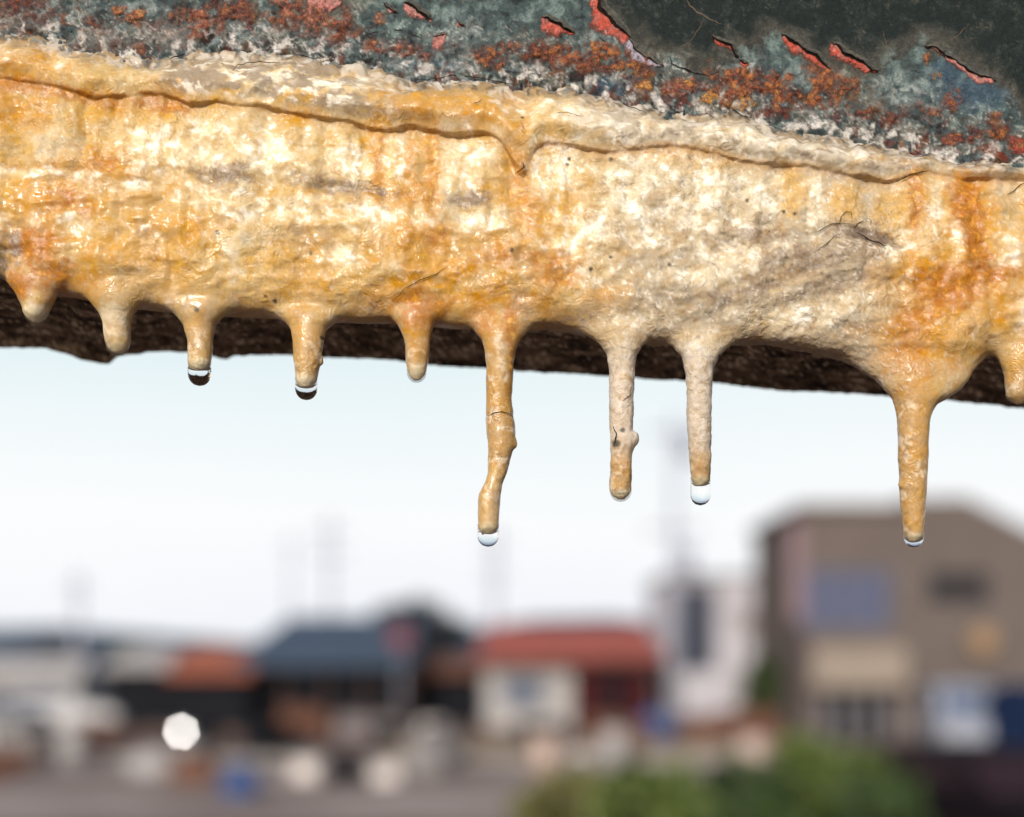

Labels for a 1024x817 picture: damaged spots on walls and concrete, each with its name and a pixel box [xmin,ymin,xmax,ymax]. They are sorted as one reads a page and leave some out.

rust [112,6,146,29]
rust [169,0,352,42]
rust [0,78,102,103]
rust [473,41,861,118]
peeling [711,34,749,66]
peeling [780,33,879,73]
peeling [924,44,997,84]
rust [941,113,1024,154]
rust [403,128,440,211]
rust [904,171,1015,325]
water stain [0,33,1024,539]